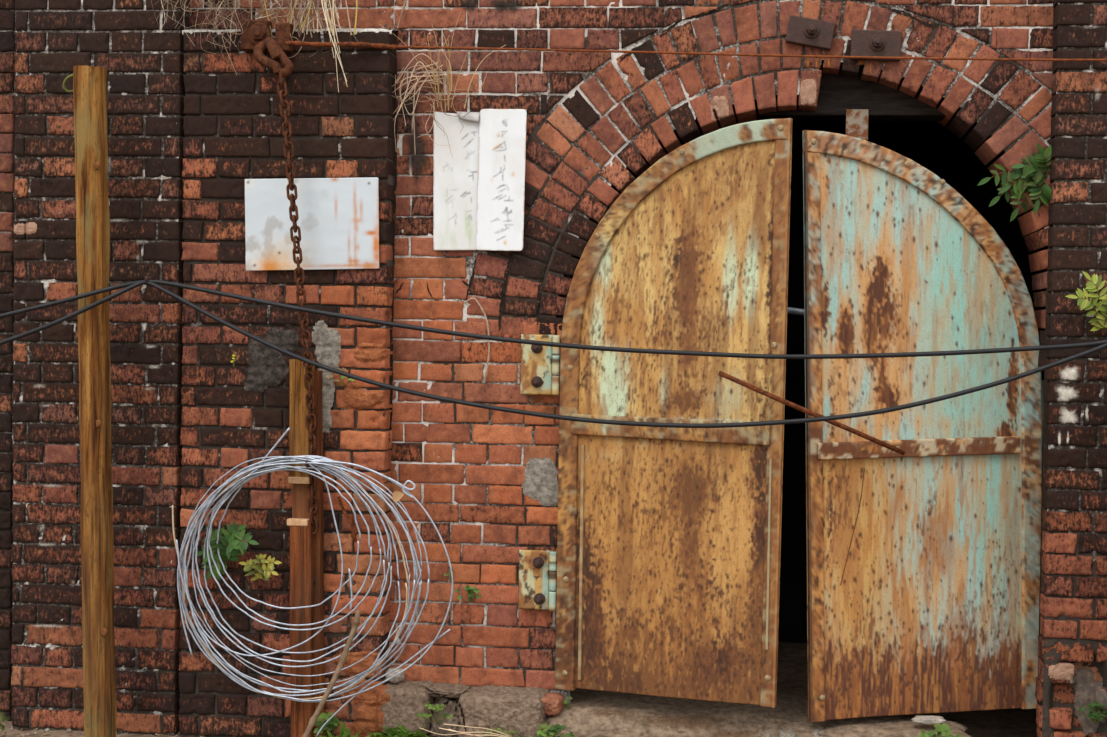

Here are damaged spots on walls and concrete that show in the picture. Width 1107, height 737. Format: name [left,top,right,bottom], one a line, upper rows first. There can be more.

spalling [244,327,298,392]
spalling [312,320,389,432]
peeling [522,457,558,506]